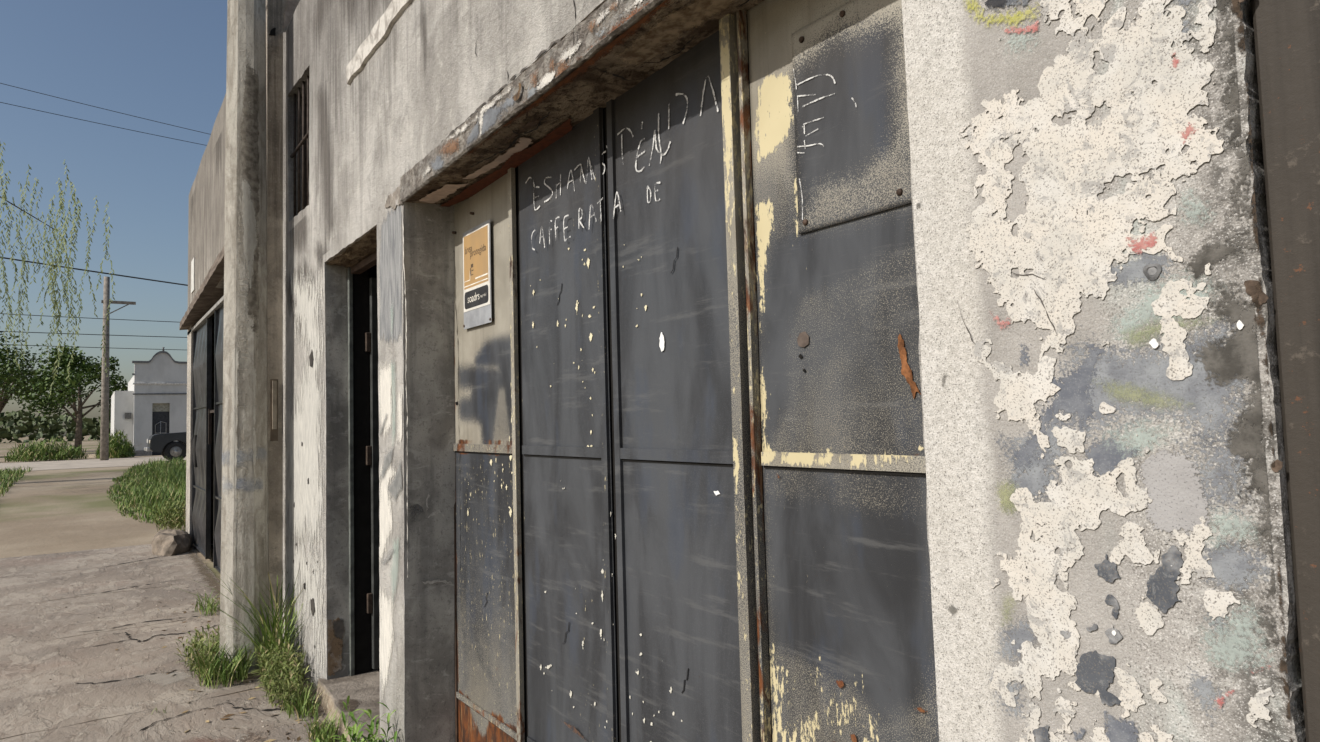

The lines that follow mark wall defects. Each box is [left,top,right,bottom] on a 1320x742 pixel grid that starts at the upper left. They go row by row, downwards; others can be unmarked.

peeling [596,0,644,25]
spalling [617,0,733,65]
peeling [446,41,581,140]
flaking render [385,137,533,210]
spalling [1244,280,1269,305]
peeling [960,0,1241,742]
crack [233,524,256,585]
crack [78,625,215,649]
peeling [1238,685,1275,728]